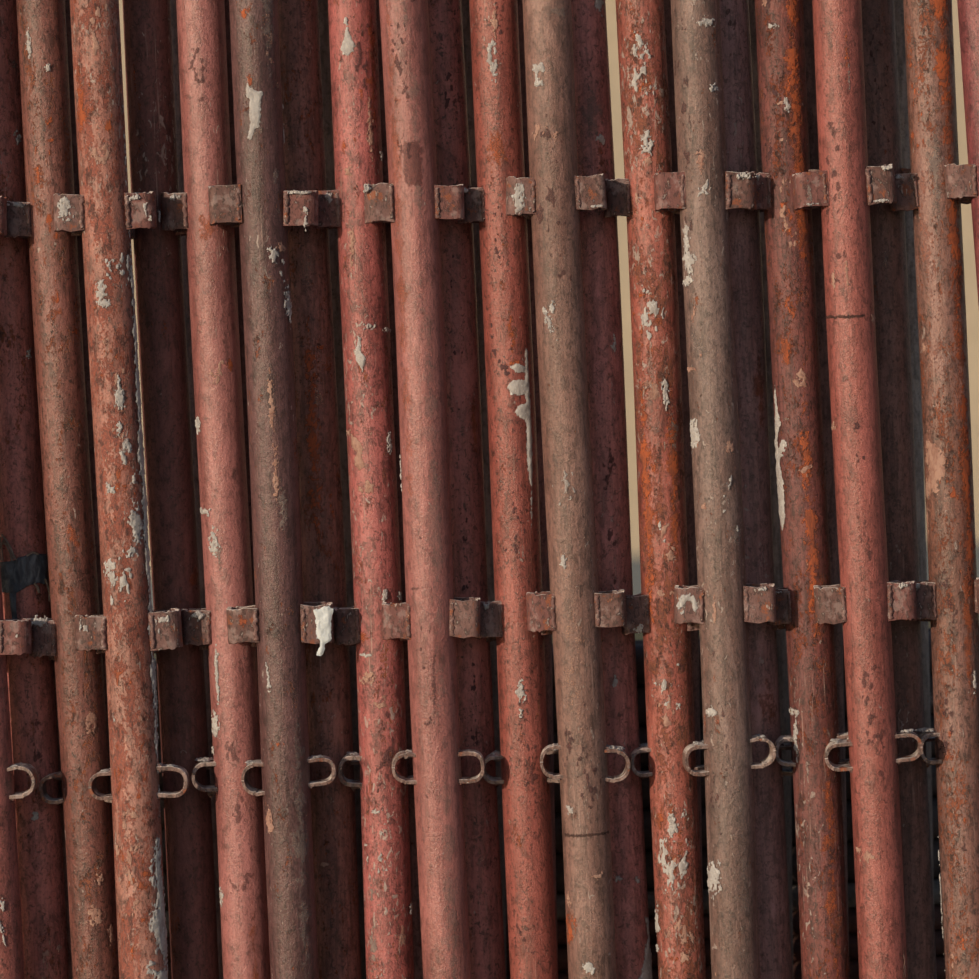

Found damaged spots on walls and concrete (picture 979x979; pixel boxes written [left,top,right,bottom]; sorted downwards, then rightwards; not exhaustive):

rust [783,0,804,174]
rust [929,0,953,164]
rust [639,385,679,623]
rust [796,395,821,638]
rust [946,199,975,679]
peeling [664,918,695,963]